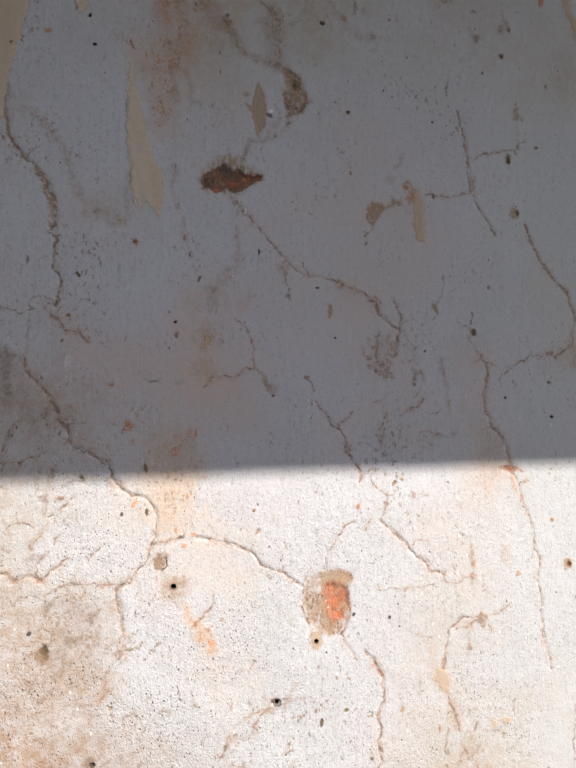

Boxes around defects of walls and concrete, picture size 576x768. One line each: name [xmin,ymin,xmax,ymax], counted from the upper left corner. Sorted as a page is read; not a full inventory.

peeling [0,0,30,117]
peeling [249,84,273,135]
crack [5,112,88,342]
crack [524,224,575,318]
crack [0,358,184,658]
crack [349,455,444,585]
crack [442,612,492,669]
crack [356,652,385,768]